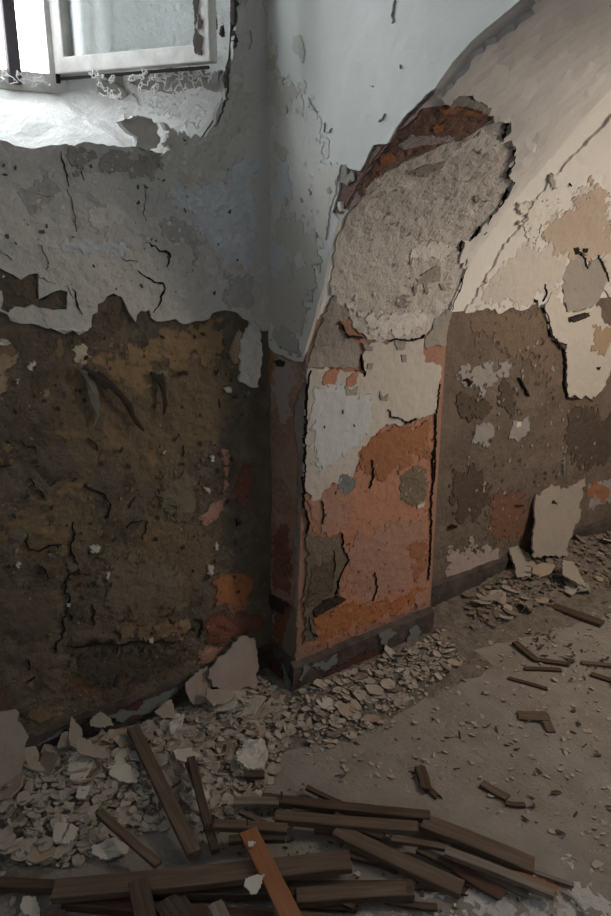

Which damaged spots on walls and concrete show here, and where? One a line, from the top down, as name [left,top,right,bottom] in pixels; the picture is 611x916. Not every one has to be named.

spalling [65,80,165,182]
spalling [0,268,88,332]
flaking render [0,338,19,395]